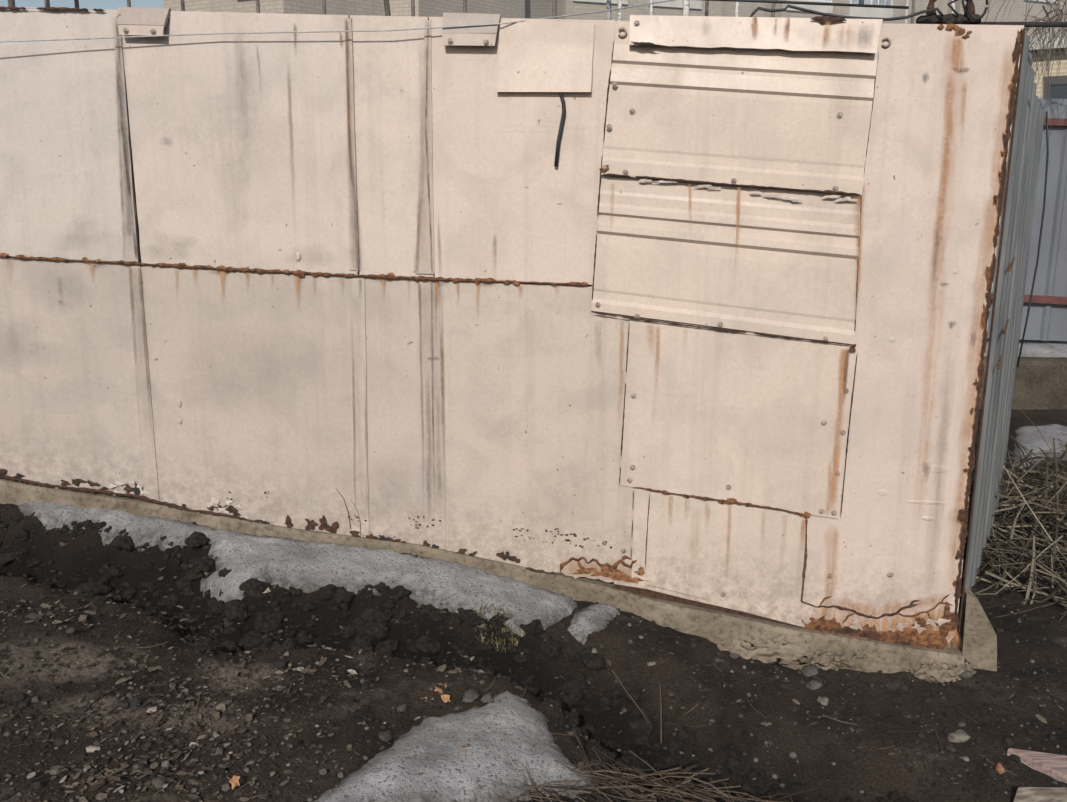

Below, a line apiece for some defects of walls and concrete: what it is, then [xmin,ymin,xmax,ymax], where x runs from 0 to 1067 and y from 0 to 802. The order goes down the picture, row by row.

corrosion [811,16,847,38]
corrosion [0,253,589,300]
corrosion [599,24,1024,650]
corrosion [592,312,856,498]
corrosion [0,469,270,524]
corrosion [285,515,407,543]
corrosion [513,528,612,548]
corrosion [496,551,558,575]